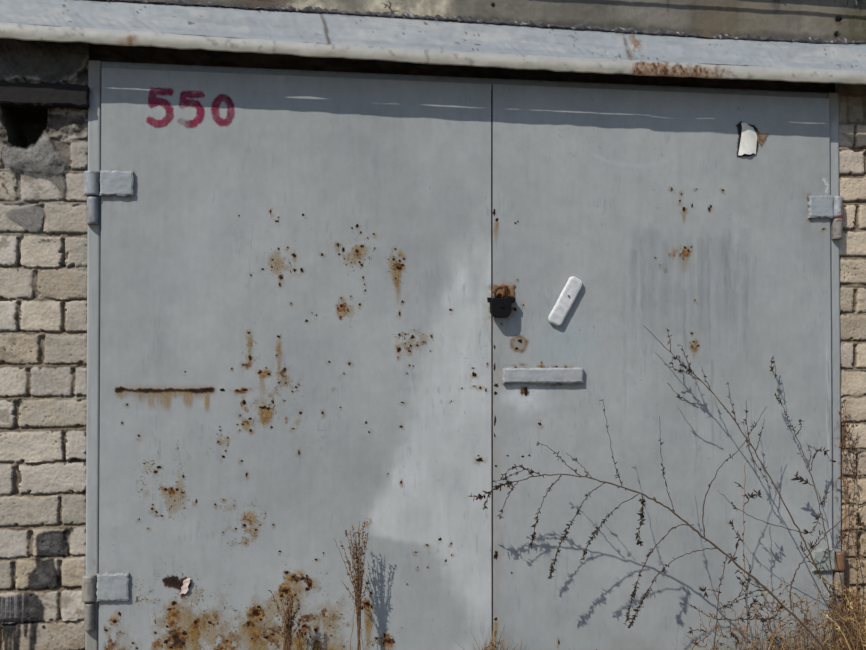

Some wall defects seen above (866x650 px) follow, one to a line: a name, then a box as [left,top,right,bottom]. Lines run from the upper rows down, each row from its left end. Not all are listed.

leakage [248,0,337,10]
leakage [365,0,449,17]
rust [633,62,717,78]
rust [336,224,375,291]
rust [388,248,405,289]
rust [115,332,299,432]
rust [227,506,274,547]
peeling [162,576,192,598]
rust [104,611,138,650]
rust [152,571,395,650]